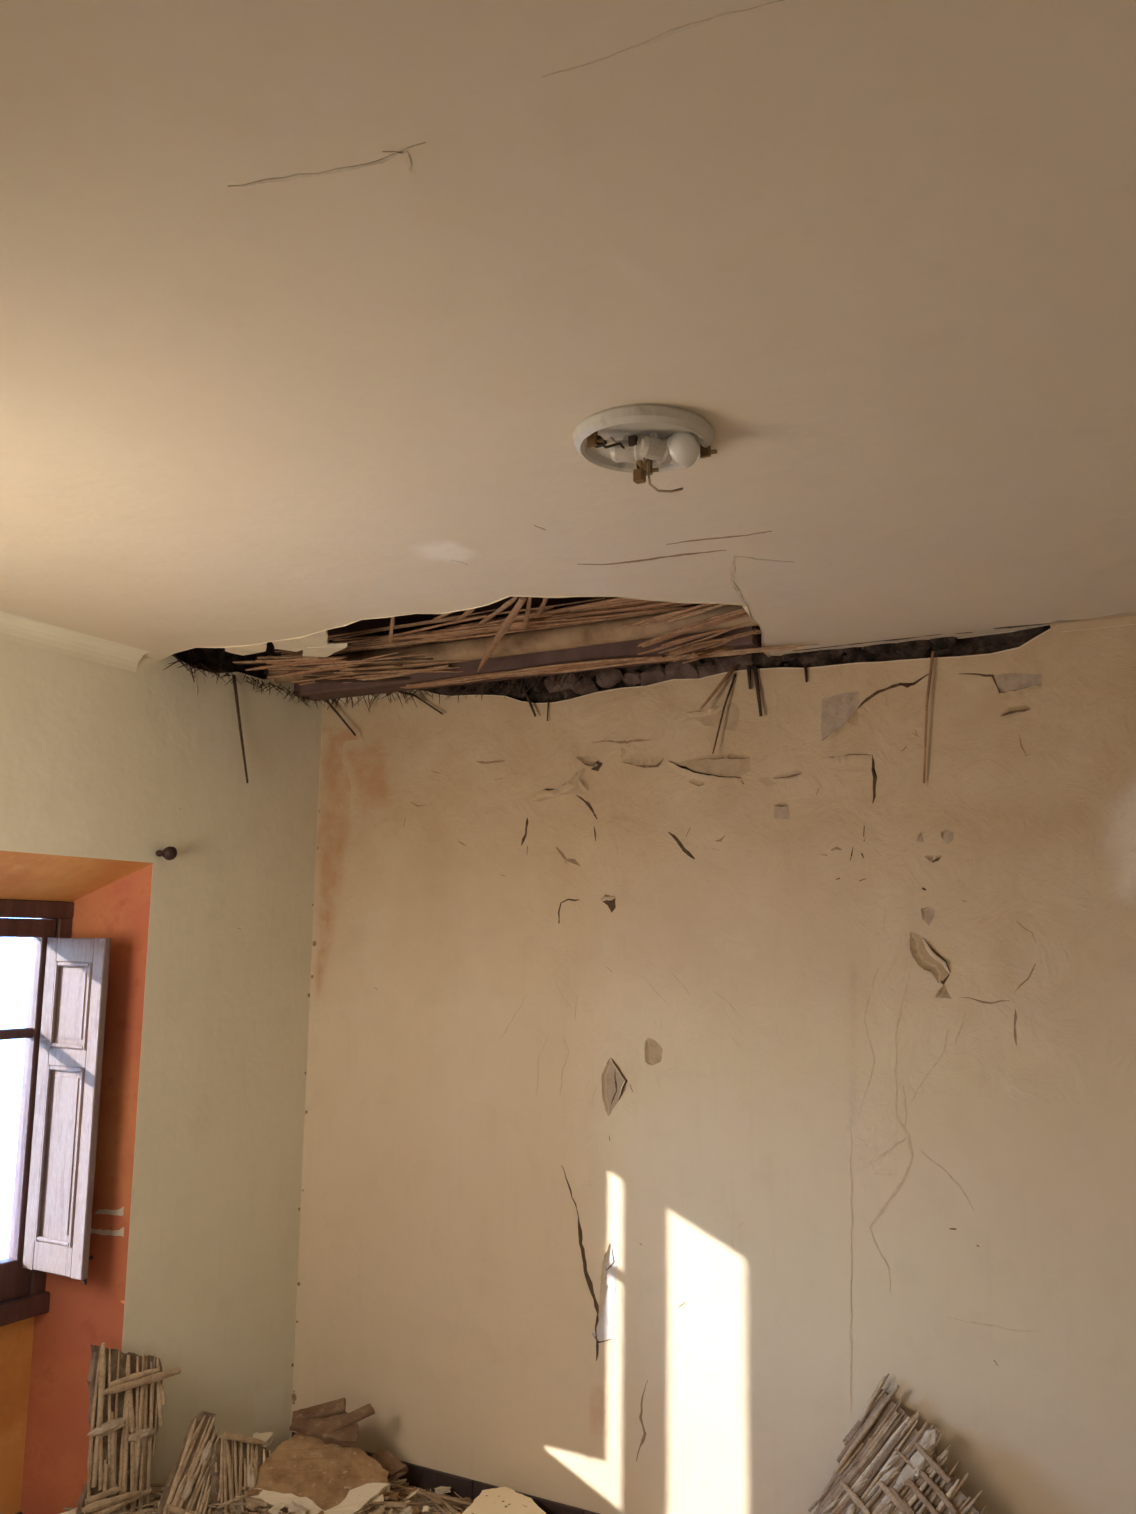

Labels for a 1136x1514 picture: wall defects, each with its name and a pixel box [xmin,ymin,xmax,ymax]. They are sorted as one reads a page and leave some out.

crack [578,531,792,605]
crack [858,673,929,708]
peeling [961,673,1042,718]
crack [596,739,648,758]
crack [668,829,725,859]
crack [820,826,886,930]
peeling [909,907,952,999]
spalling [601,1058,628,1116]
spalling [644,1038,663,1066]
crack [849,924,1041,1407]
crack [561,1165,599,1361]
crack [636,1380,648,1462]